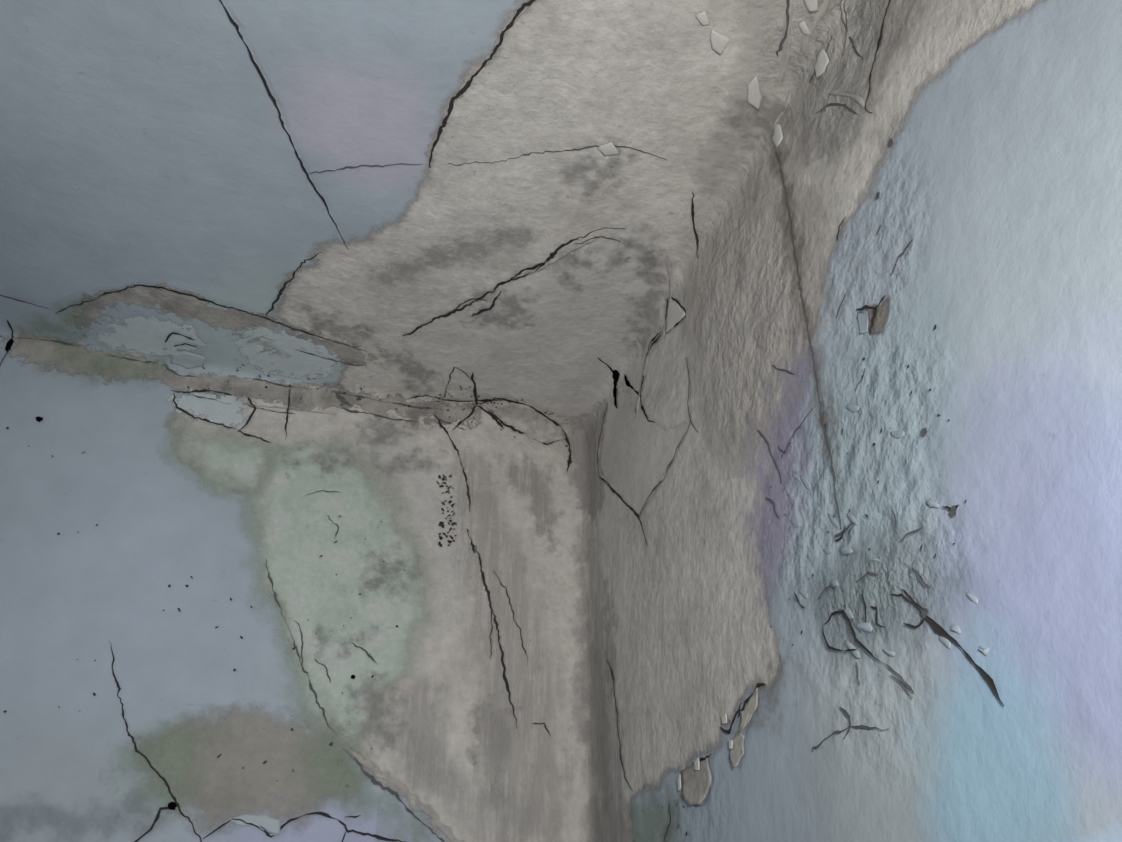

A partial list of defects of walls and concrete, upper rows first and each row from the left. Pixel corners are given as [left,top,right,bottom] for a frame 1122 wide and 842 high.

crack [0,0,665,351]
crack [691,192,699,257]
flaking render [69,284,367,381]
flaking render [8,316,505,429]
flaking render [166,0,1043,842]
crack [109,641,405,842]
water stain [174,433,426,743]
water stain [578,533,672,842]
crack [812,707,889,752]
crack [795,567,1004,707]
crack [892,511,923,542]